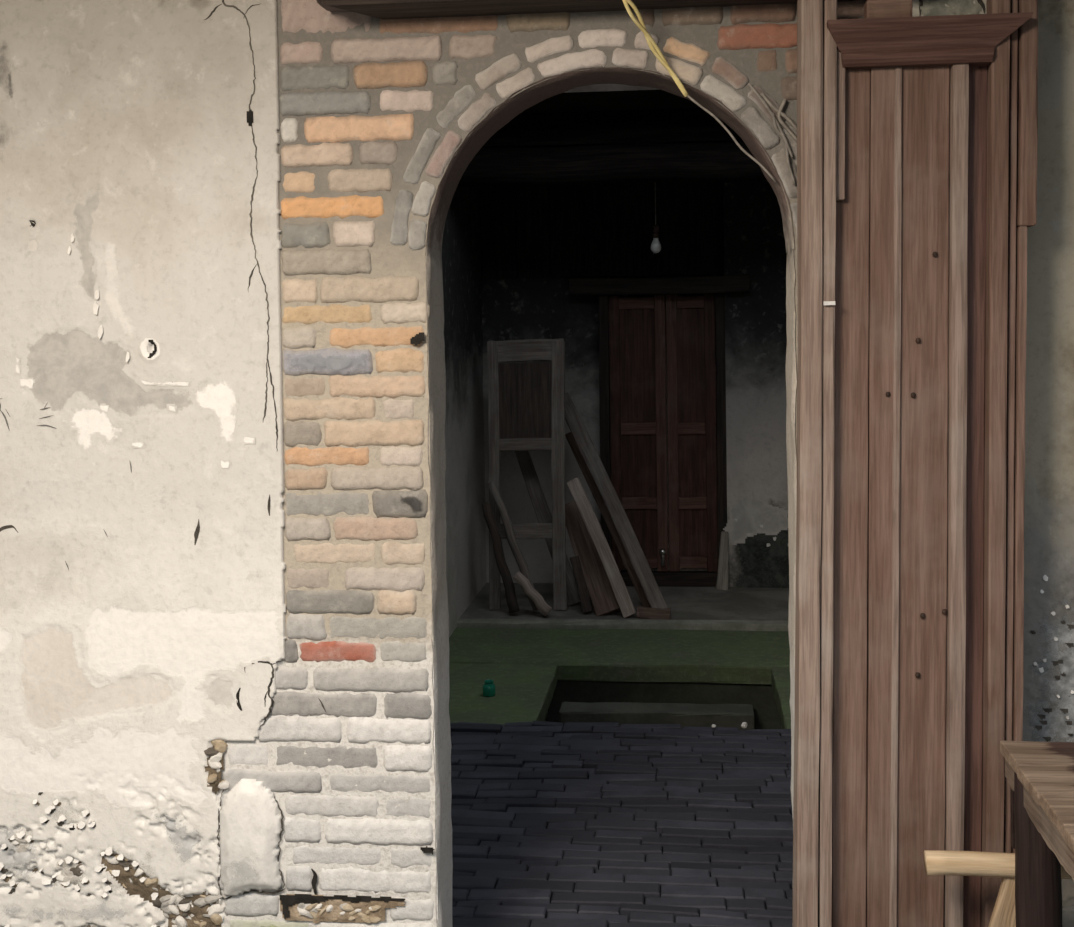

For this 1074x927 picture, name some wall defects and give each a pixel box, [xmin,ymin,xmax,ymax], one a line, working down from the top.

crack [204,0,278,450]
peeling [12,625,175,739]
crack [236,660,285,728]
flaking render [204,740,230,794]
peeling [33,792,96,830]
flaking render [0,827,34,894]
flaking render [32,847,226,927]
spalling [280,894,405,924]